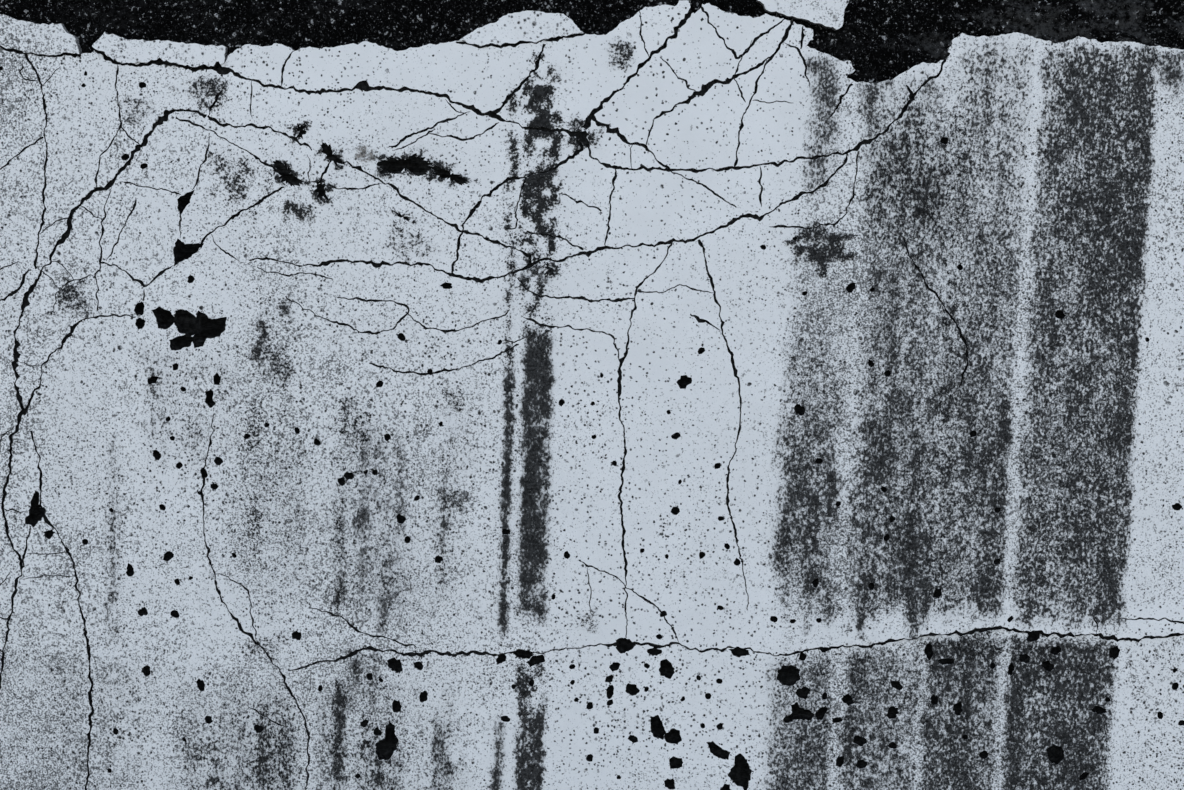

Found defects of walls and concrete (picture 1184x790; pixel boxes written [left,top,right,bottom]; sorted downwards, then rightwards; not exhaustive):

crack [0,7,950,790]
leakage [489,661,548,790]
leakage [495,51,567,640]
crack [745,614,1184,656]
leakage [763,36,1184,790]